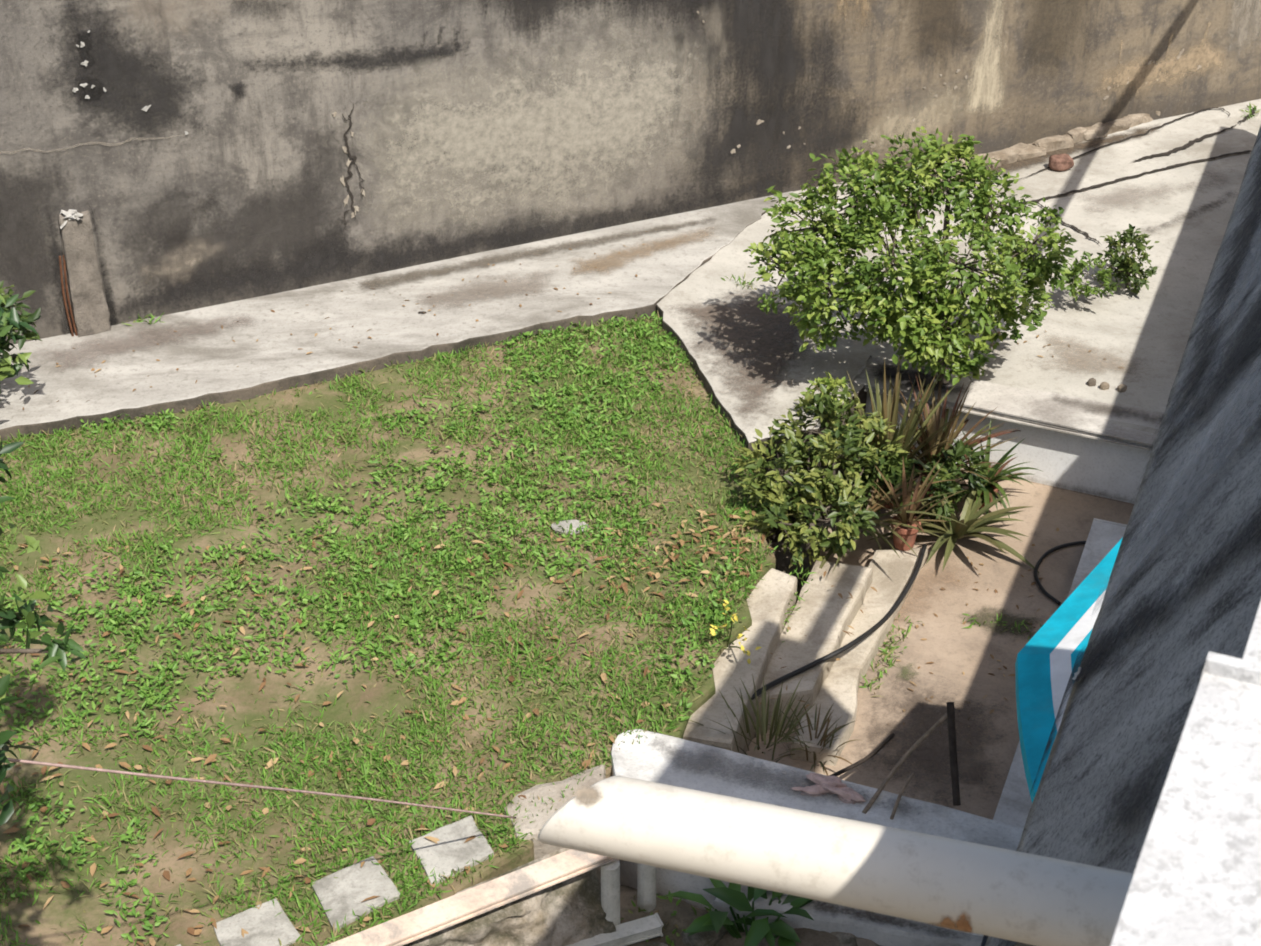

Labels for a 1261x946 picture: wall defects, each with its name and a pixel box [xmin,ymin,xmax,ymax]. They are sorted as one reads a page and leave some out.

spalling [72,30,106,100]
crack [332,100,365,226]
water stain [122,0,1004,314]
crack [1020,107,1257,244]
rust [59,255,78,336]
rust [937,914,972,932]